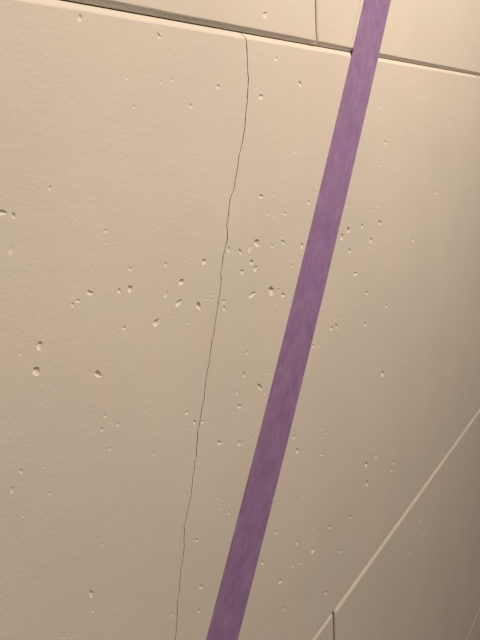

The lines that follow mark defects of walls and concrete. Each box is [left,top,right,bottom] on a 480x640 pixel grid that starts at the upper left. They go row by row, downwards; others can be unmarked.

crack [175,38,249,640]